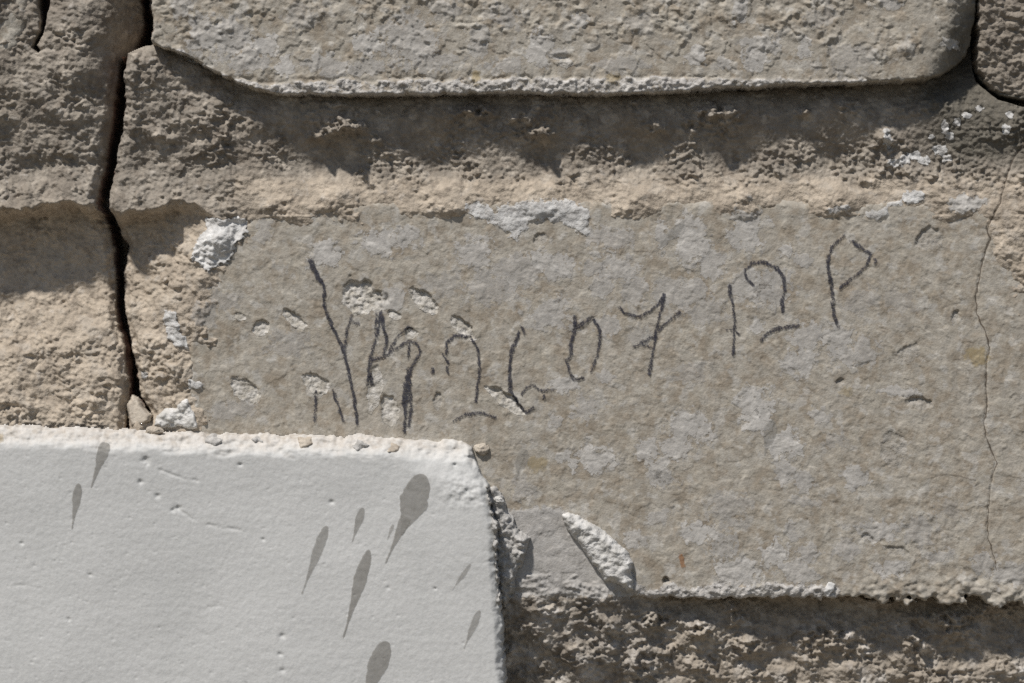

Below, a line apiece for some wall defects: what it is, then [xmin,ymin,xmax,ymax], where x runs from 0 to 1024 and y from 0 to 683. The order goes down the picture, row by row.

crack [96,0,153,429]
damp [191,216,249,274]
crack [975,142,1024,570]
damp [72,442,110,528]
damp [302,526,328,593]
damp [343,550,371,637]
damp [353,507,364,538]
damp [385,474,430,563]
damp [366,641,391,683]